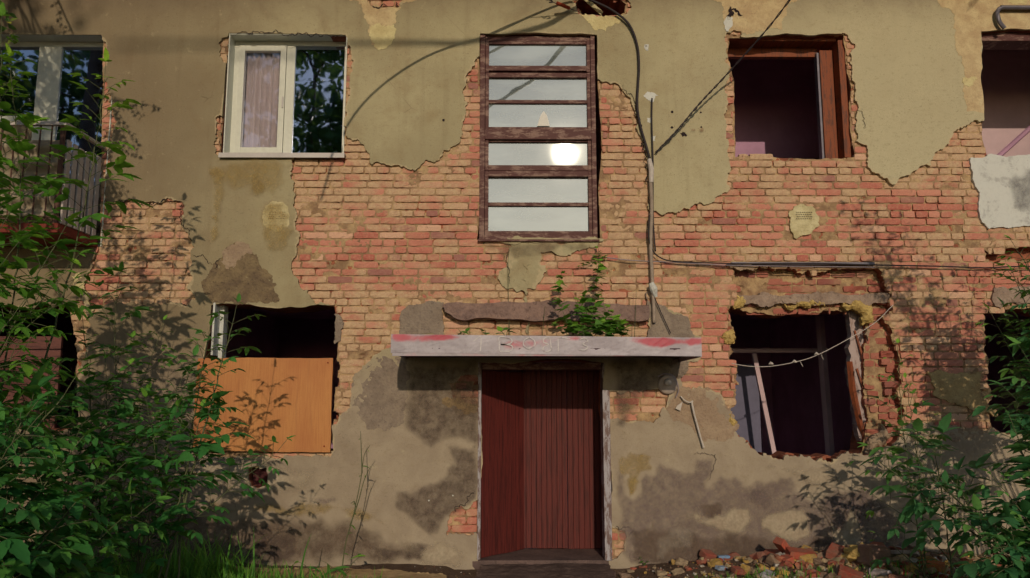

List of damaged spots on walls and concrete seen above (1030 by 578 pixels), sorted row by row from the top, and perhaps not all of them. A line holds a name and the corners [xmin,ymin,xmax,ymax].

flaking render [70,38,280,377]
flaking render [291,0,1030,442]
leakage [409,367,478,440]
leakage [120,510,389,565]
leakage [407,543,459,566]
flaking render [446,501,477,535]
leakage [620,455,901,563]